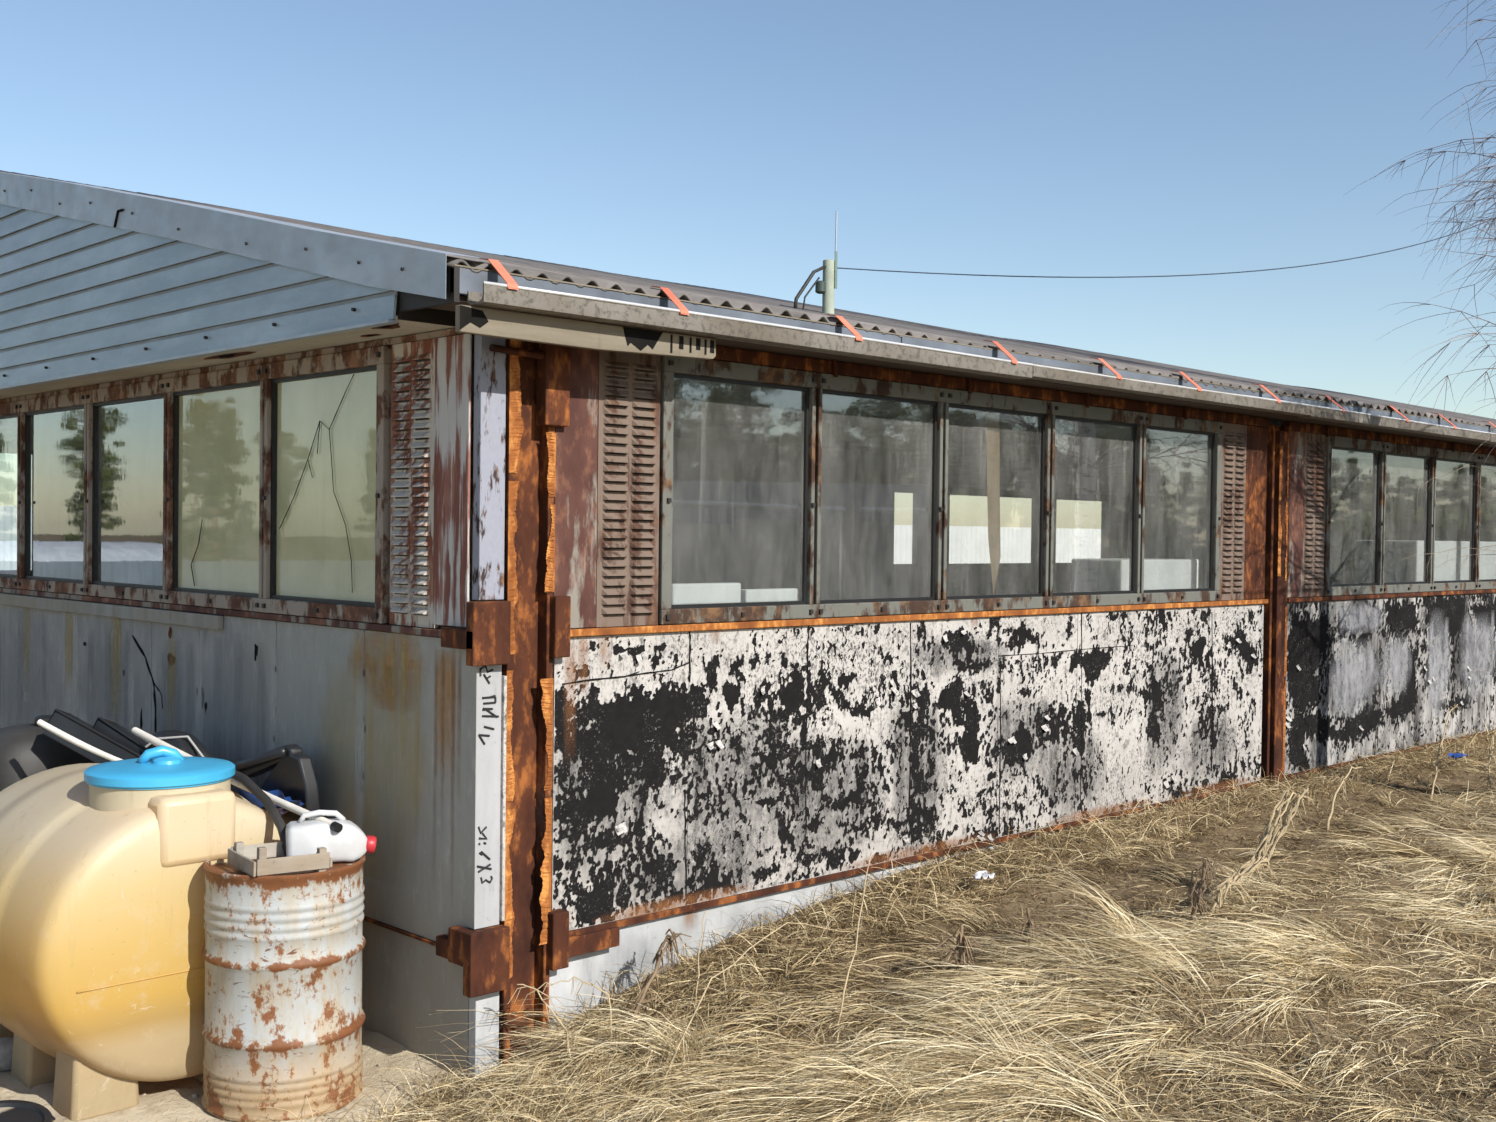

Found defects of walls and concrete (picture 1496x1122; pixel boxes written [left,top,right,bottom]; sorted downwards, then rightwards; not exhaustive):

corrosion [544,432,556,592]
corrosion [1278,438,1289,581]
corrosion [504,339,524,979]
corrosion [539,678,554,945]
peeling [553,605,1263,928]
peeling [1285,594,1496,774]